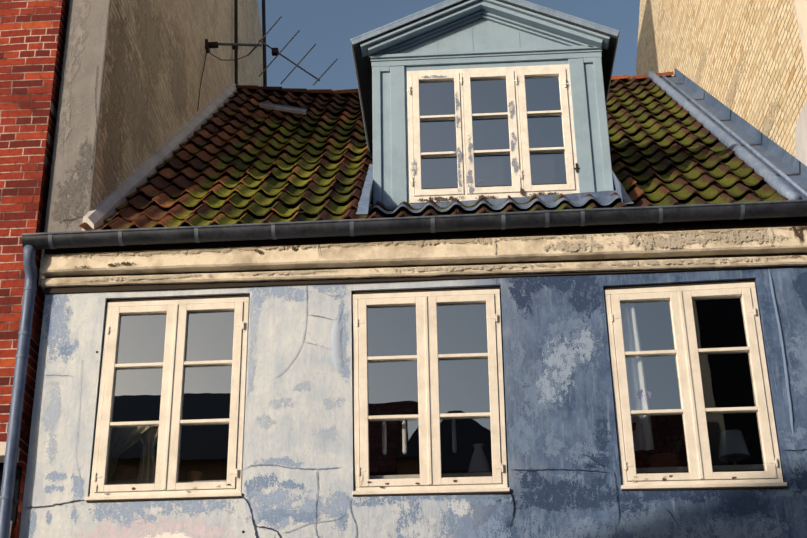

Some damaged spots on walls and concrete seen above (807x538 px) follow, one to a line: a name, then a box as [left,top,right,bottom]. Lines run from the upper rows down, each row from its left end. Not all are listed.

damp [43,226,807,258]
crack [273,288,342,378]
damp [496,275,606,330]
peeling [528,311,605,414]
crack [25,357,84,508]
flaking render [535,416,612,486]
flaking render [62,472,474,538]
crack [243,464,357,538]
damp [340,466,807,538]